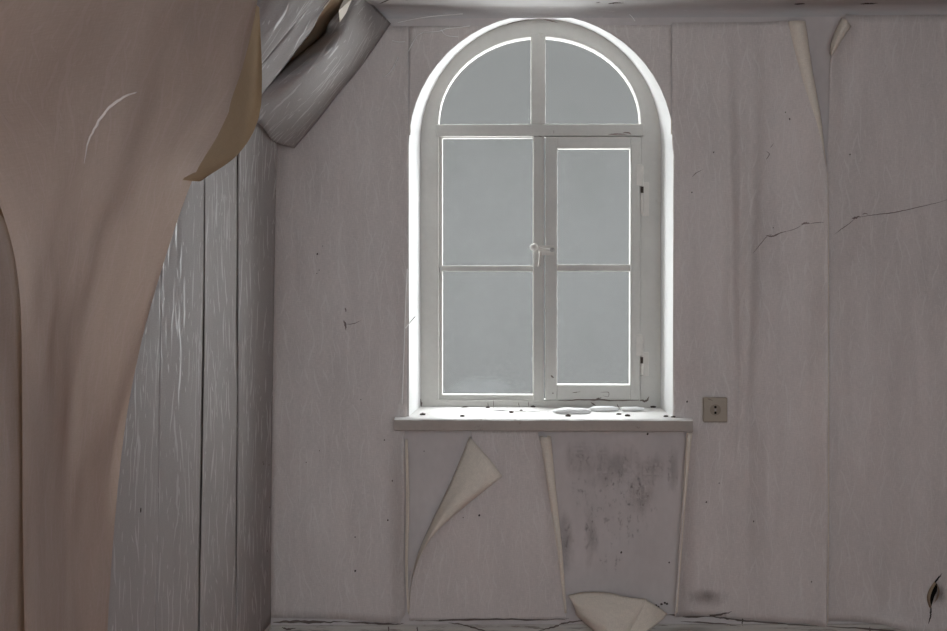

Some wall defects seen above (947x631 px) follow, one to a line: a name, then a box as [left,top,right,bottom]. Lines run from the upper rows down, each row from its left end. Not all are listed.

crack [753,200,945,253]